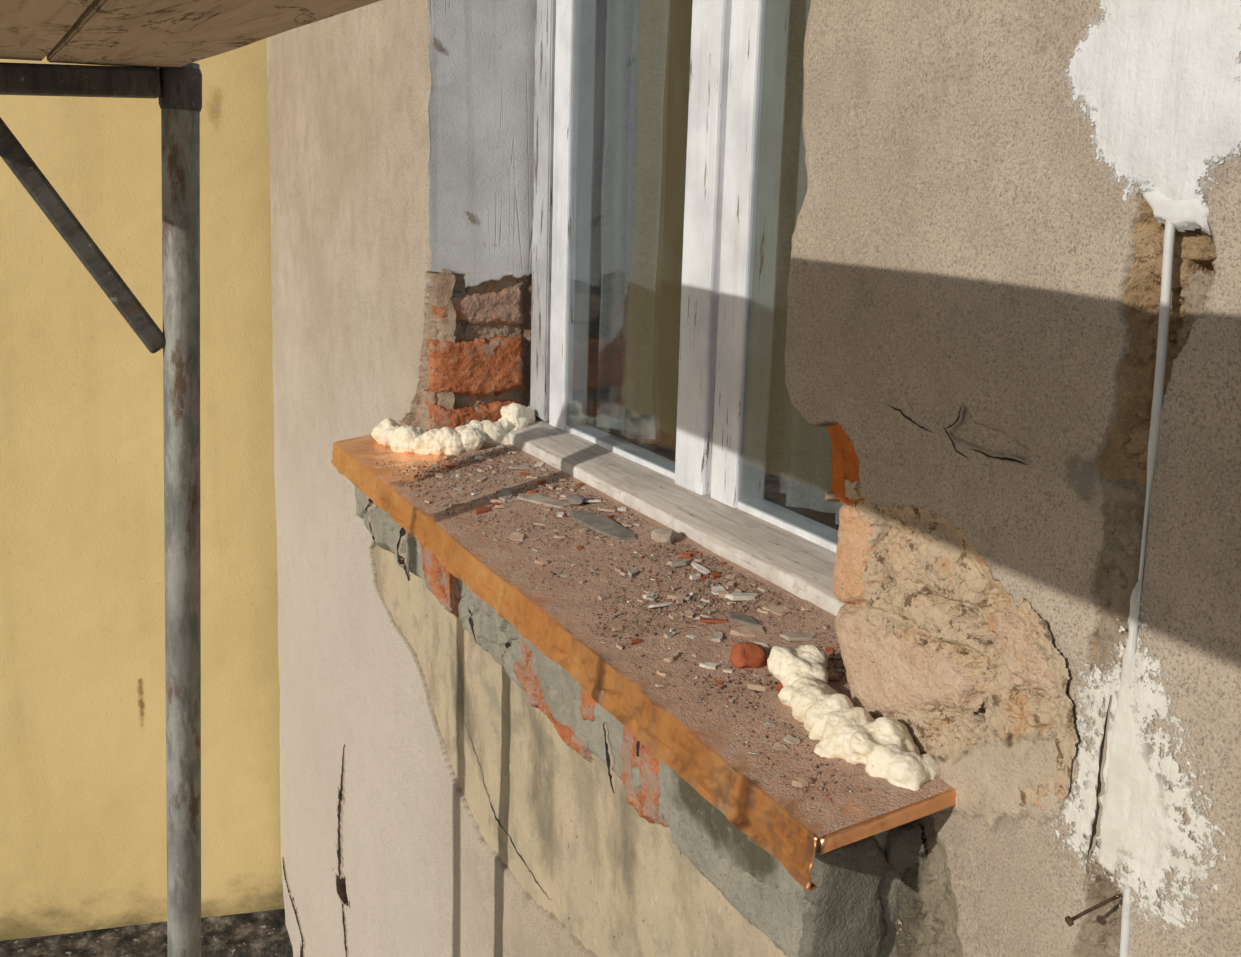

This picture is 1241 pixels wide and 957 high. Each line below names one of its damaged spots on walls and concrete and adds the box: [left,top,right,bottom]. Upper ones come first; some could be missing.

flaking render [400,269,532,432]
crack [888,401,1029,465]
flaking render [827,424,1079,957]
crack [282,857,306,957]
crack [333,744,350,957]
crack [466,725,552,900]
crack [1087,695,1112,862]